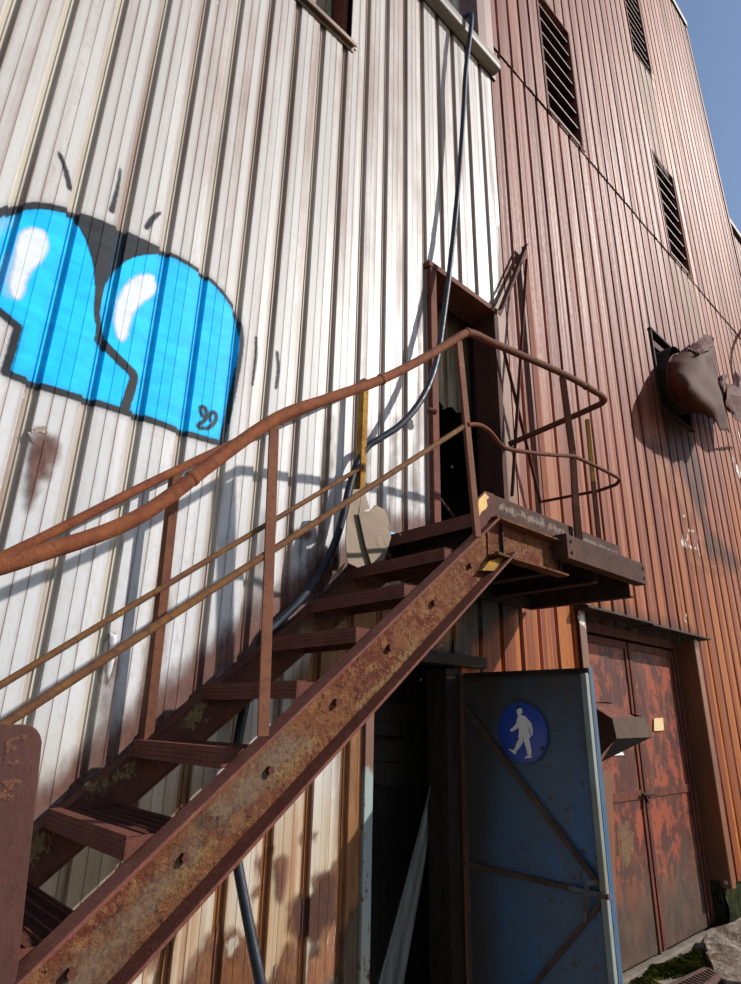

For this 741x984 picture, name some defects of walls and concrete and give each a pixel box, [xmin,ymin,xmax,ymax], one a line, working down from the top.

corrosion [27,426,59,506]
corrosion [307,726,363,984]